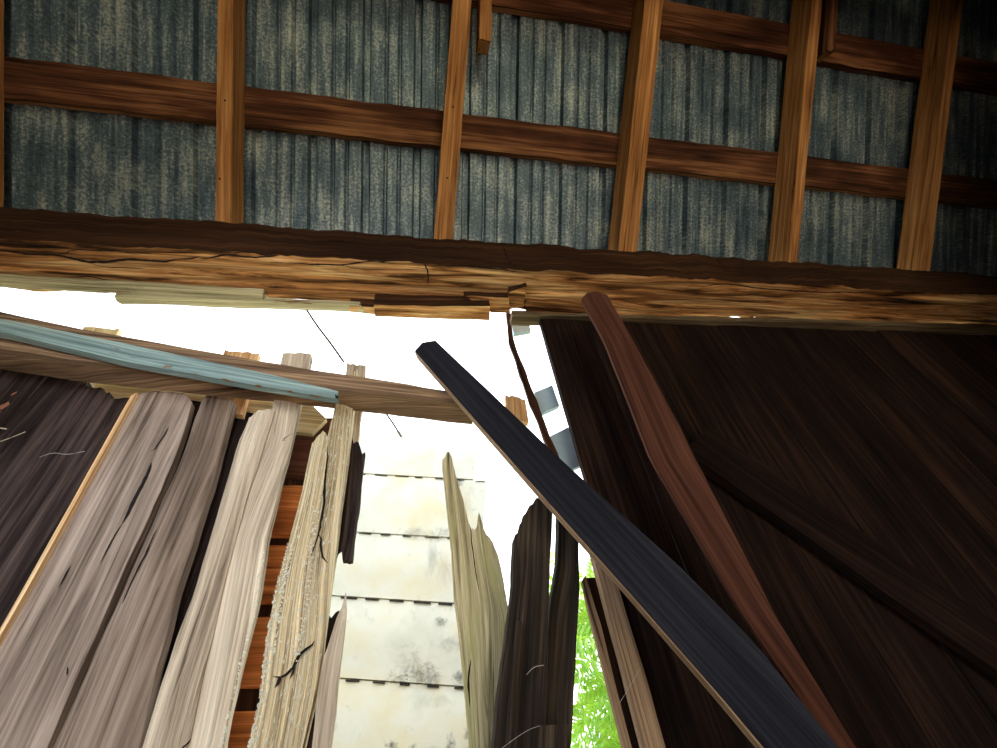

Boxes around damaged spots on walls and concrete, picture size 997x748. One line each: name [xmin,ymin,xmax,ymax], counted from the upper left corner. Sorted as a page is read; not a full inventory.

crack [311,447,329,563]
crack [273,642,314,688]